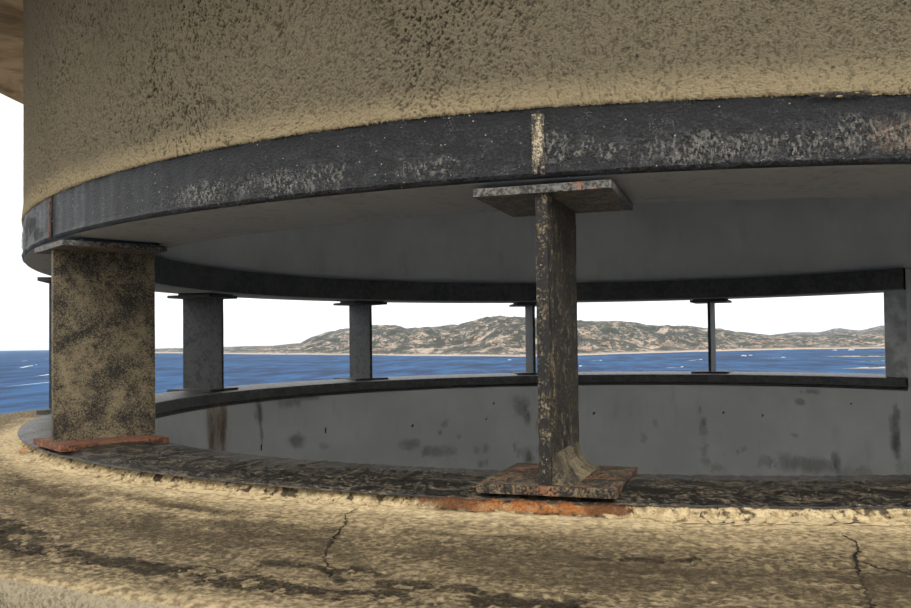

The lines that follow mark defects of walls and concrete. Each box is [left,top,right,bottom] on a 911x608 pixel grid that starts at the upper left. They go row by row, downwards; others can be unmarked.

rust [416,496,633,516]
crack [322,508,358,581]
crack [842,533,910,608]